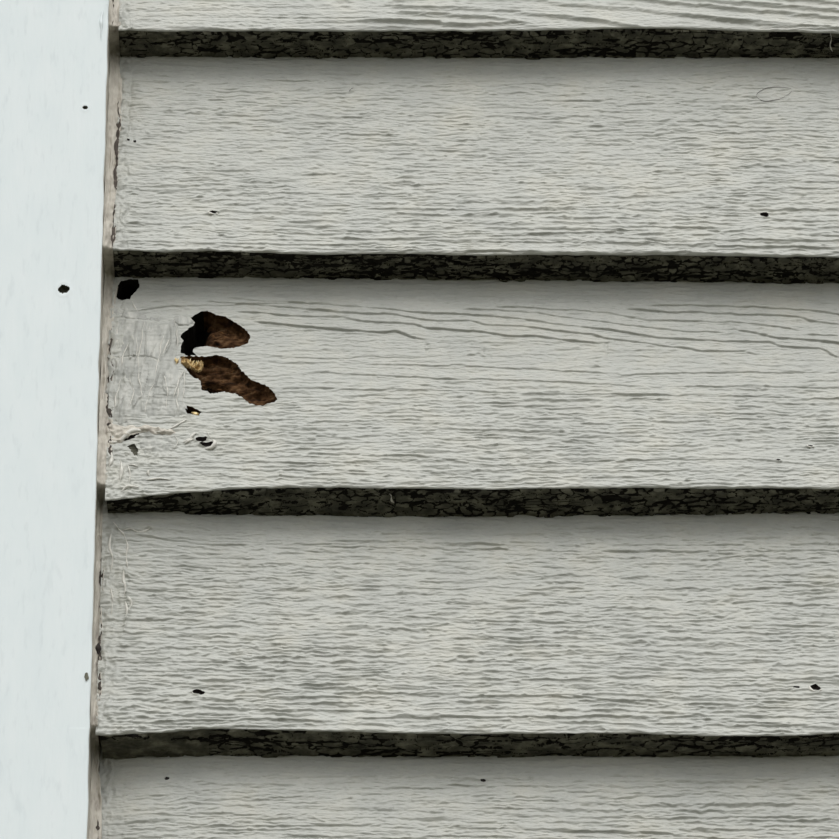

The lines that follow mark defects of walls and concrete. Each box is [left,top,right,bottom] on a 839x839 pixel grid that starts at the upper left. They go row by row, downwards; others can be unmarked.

spalling [180,311,277,406]
peeling [106,419,217,491]